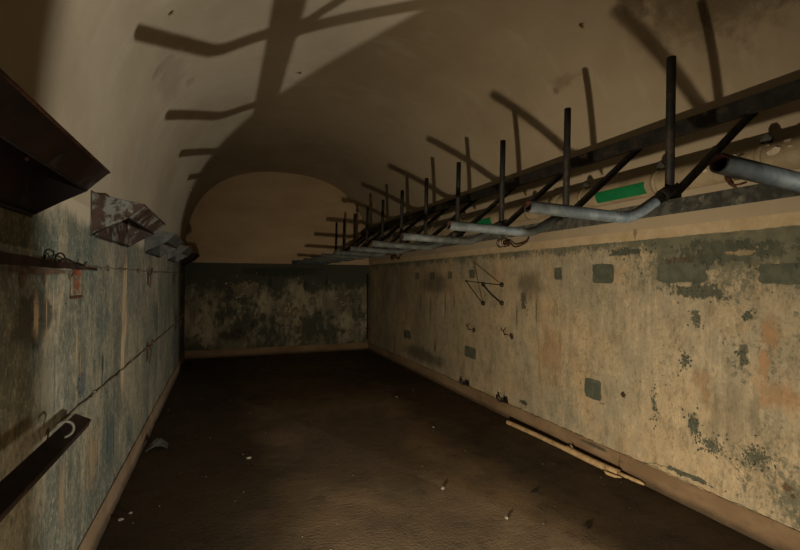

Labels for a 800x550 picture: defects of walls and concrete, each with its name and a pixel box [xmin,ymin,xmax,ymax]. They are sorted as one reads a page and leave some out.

peeling [670,234,800,270]